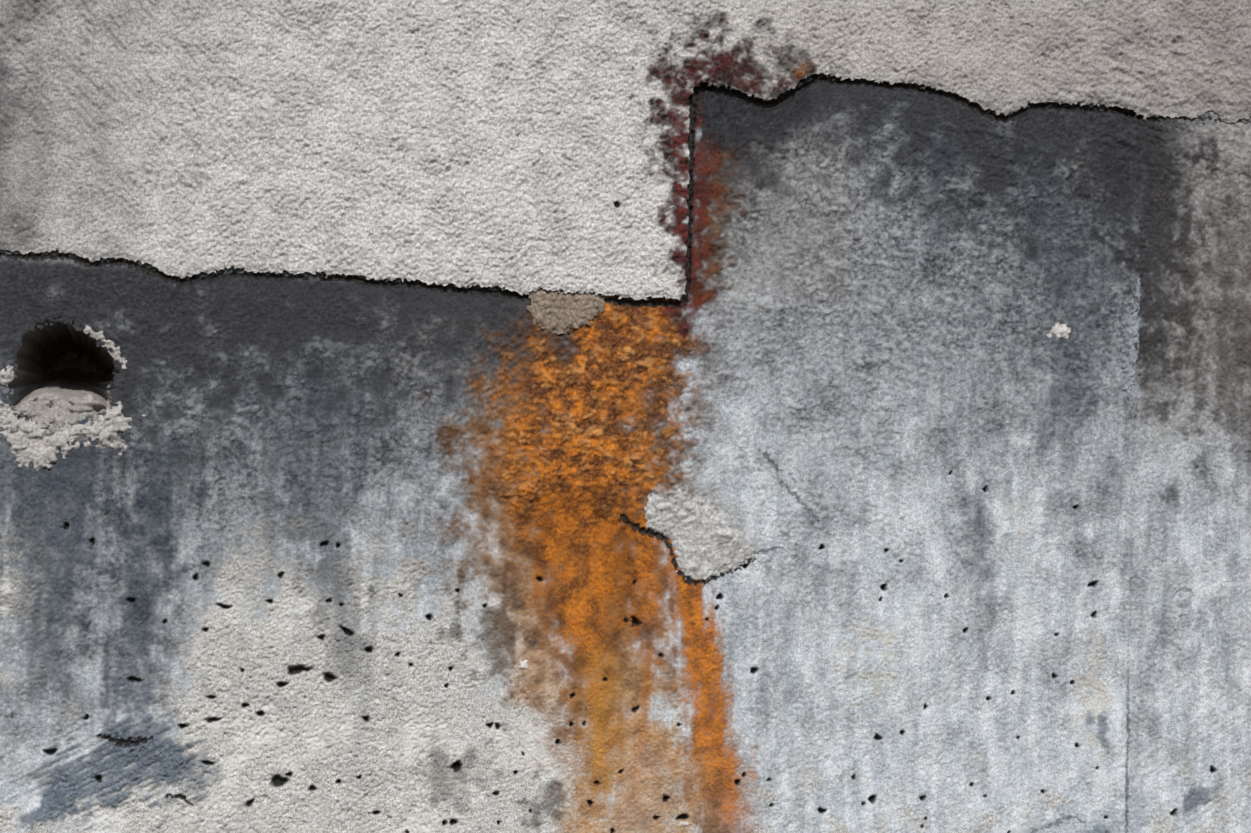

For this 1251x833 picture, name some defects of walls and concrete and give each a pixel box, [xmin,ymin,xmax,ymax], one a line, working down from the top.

damp [695,73,1217,366]
spalling [0,316,147,476]
damp [0,262,531,440]
peeling [524,288,607,334]
rust [471,12,814,833]
spalling [1046,322,1072,340]
damp [1195,256,1251,418]
damp [9,421,127,652]
damp [125,452,219,642]
spalling [278,666,309,687]
peeling [21,715,214,829]
spalling [272,773,292,786]